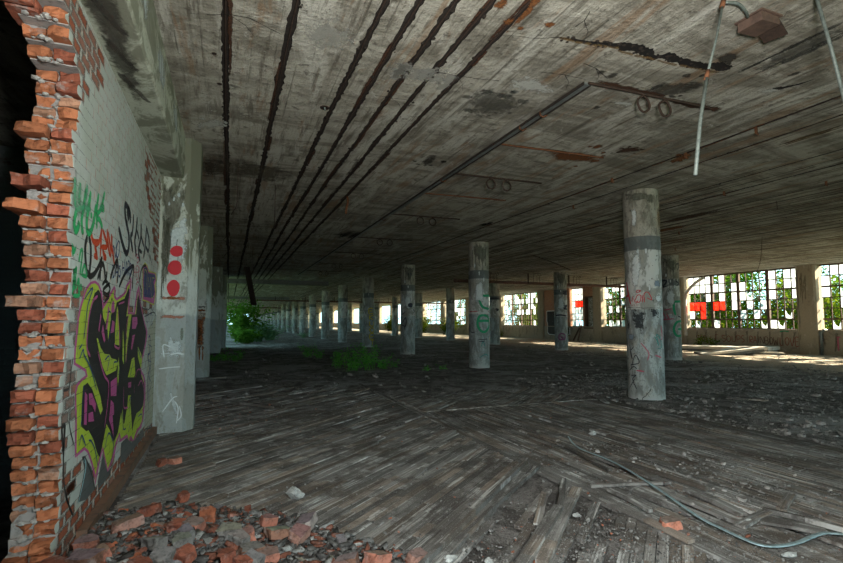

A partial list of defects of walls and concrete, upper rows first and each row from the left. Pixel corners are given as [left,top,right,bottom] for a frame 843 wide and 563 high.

peeling [64,0,104,103]
crack [492,11,739,88]
peeling [145,146,184,263]
peeling [169,219,187,268]
spalling [221,0,233,245]
spalling [227,0,532,303]
corrosion [501,144,606,167]
spalling [676,95,841,158]